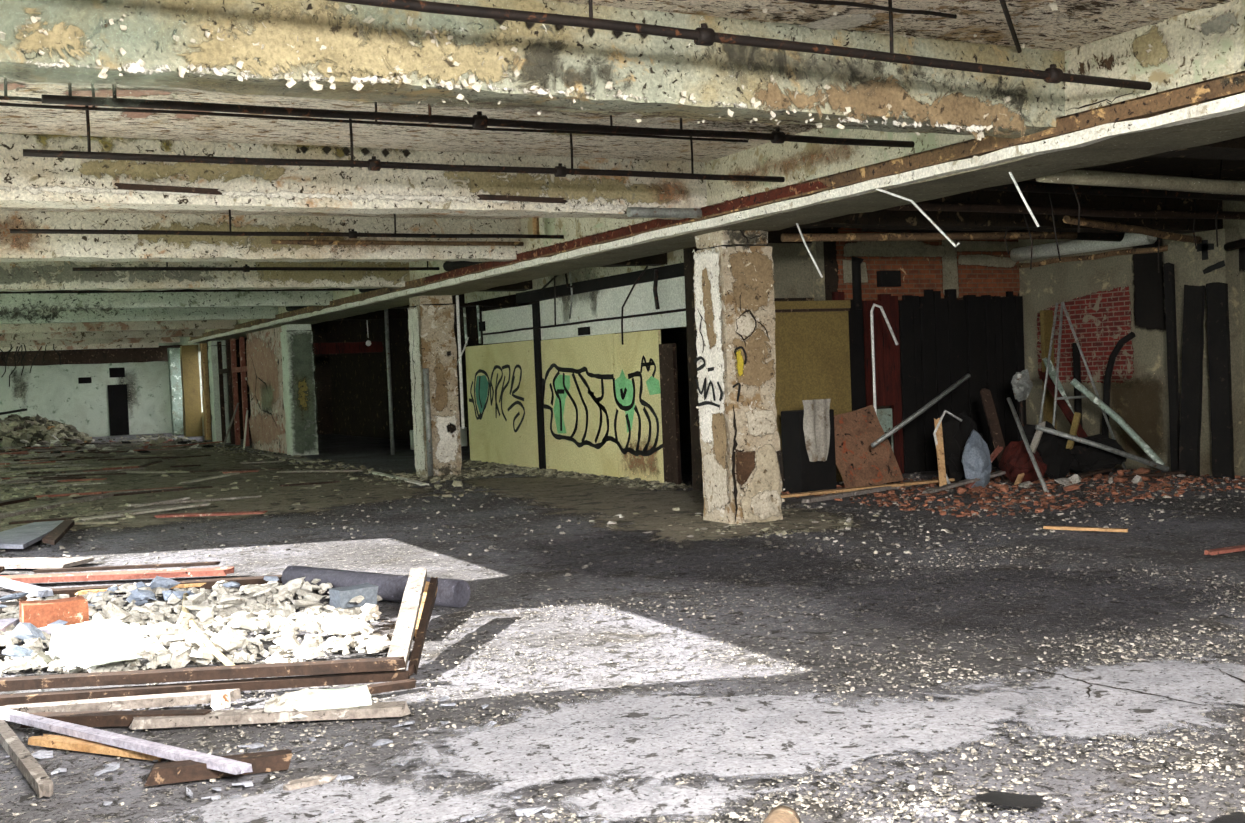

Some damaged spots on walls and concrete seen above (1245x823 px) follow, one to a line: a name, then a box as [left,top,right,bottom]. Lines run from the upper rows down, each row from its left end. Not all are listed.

peeling [0,2,1039,155]
water stain [505,34,631,104]
spalling [323,146,411,157]
peeling [0,219,410,285]
flaking render [728,251,775,319]
flaking render [701,268,775,387]
peeling [696,403,761,496]